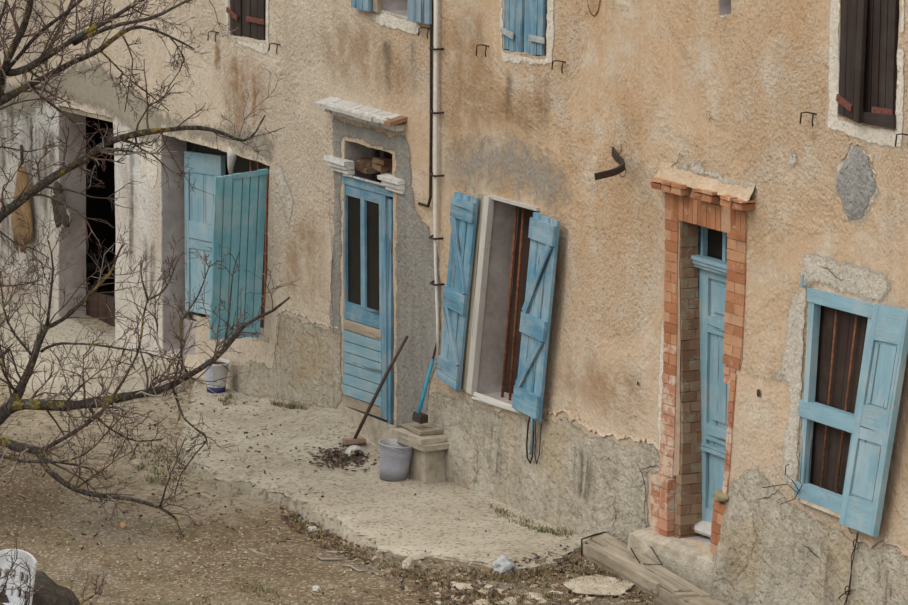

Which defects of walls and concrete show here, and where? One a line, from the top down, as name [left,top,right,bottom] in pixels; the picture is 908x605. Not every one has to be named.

peeling [232,307,342,409]
peeling [428,324,667,545]
crack [755,305,806,501]
peeling [711,465,908,605]